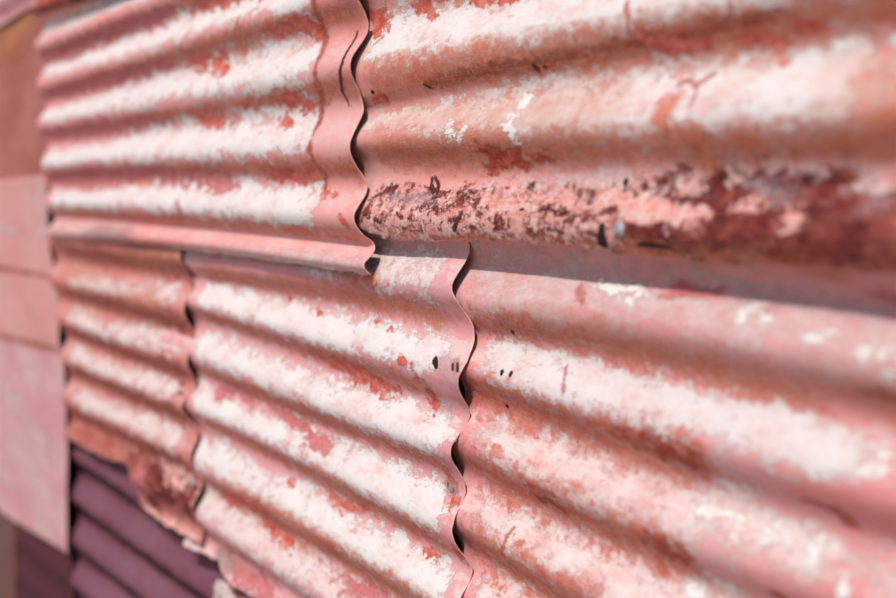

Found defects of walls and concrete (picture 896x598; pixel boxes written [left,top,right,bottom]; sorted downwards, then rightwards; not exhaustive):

peeling [33,0,339,240]
peeling [360,0,896,205]
rust [360,109,896,273]
rust [369,0,896,95]
rust [61,323,186,381]
peeling [67,269,181,308]
rust [64,363,187,424]
peeling [63,304,190,459]
rust [63,283,191,334]
rust [209,371,440,467]
peeling [163,238,896,598]
rust [64,401,449,598]